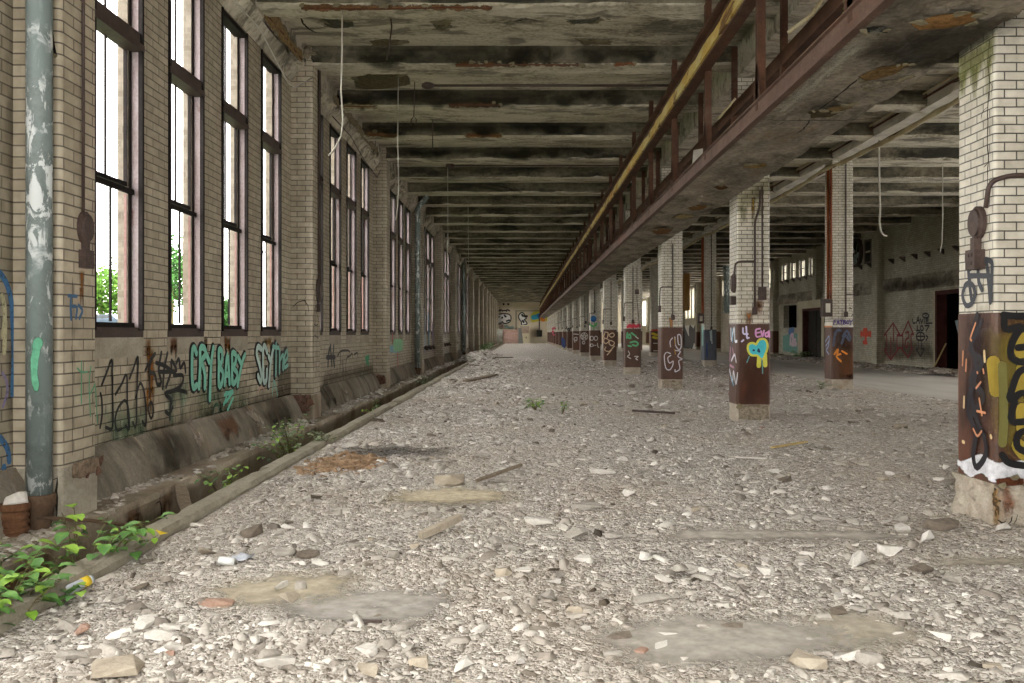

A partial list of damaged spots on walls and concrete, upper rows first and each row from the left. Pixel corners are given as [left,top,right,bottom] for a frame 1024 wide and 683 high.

spalling [909,11,988,30]
spalling [857,62,916,84]
water stain [777,23,1004,112]